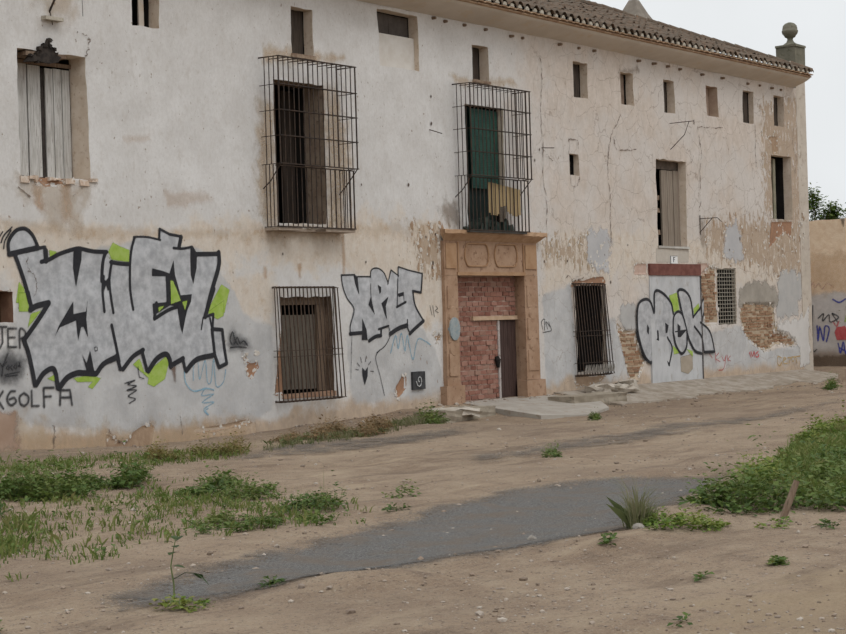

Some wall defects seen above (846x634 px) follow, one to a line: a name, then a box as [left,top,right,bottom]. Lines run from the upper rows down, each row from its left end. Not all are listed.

crack [607,114,636,242]
flaking render [706,98,805,281]
flaking render [698,261,719,326]
flaking render [616,323,646,379]
flaking render [739,302,798,353]